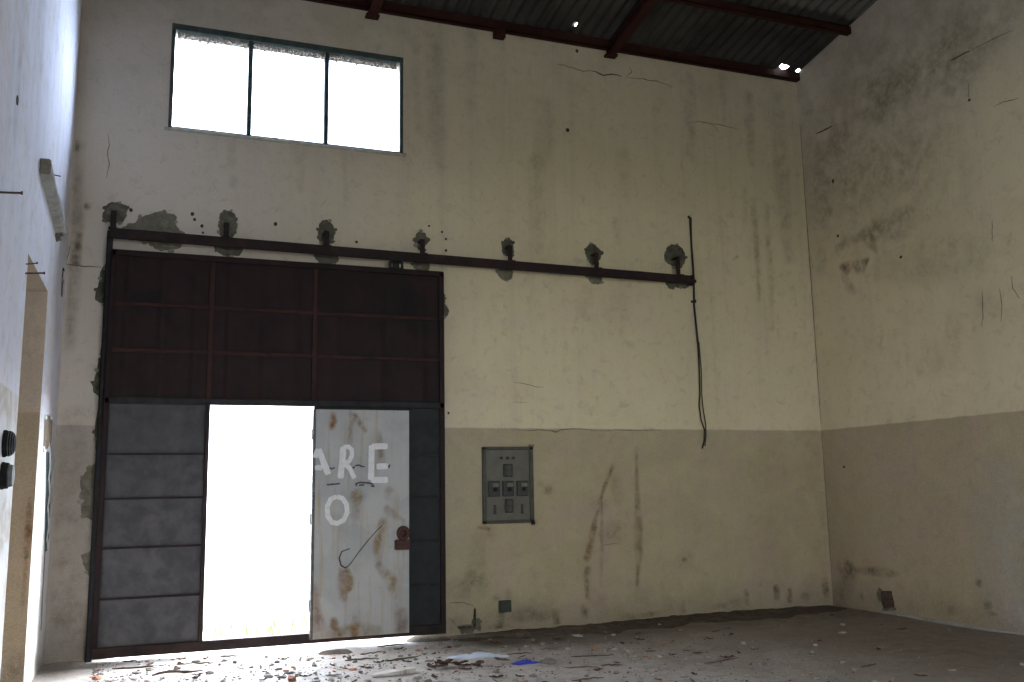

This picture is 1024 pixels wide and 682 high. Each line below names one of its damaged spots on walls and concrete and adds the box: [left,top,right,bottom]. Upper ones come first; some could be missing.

crack [558,64,672,87]
flaking render [102,201,185,253]
flaking render [214,209,243,257]
flaking render [313,219,339,264]
flaking render [410,225,447,271]
flaking render [495,269,513,282]
flaking render [501,237,515,257]
flaking render [584,242,604,285]
flaking render [664,243,688,269]
flaking render [666,282,689,290]
flaking render [77,464,95,520]